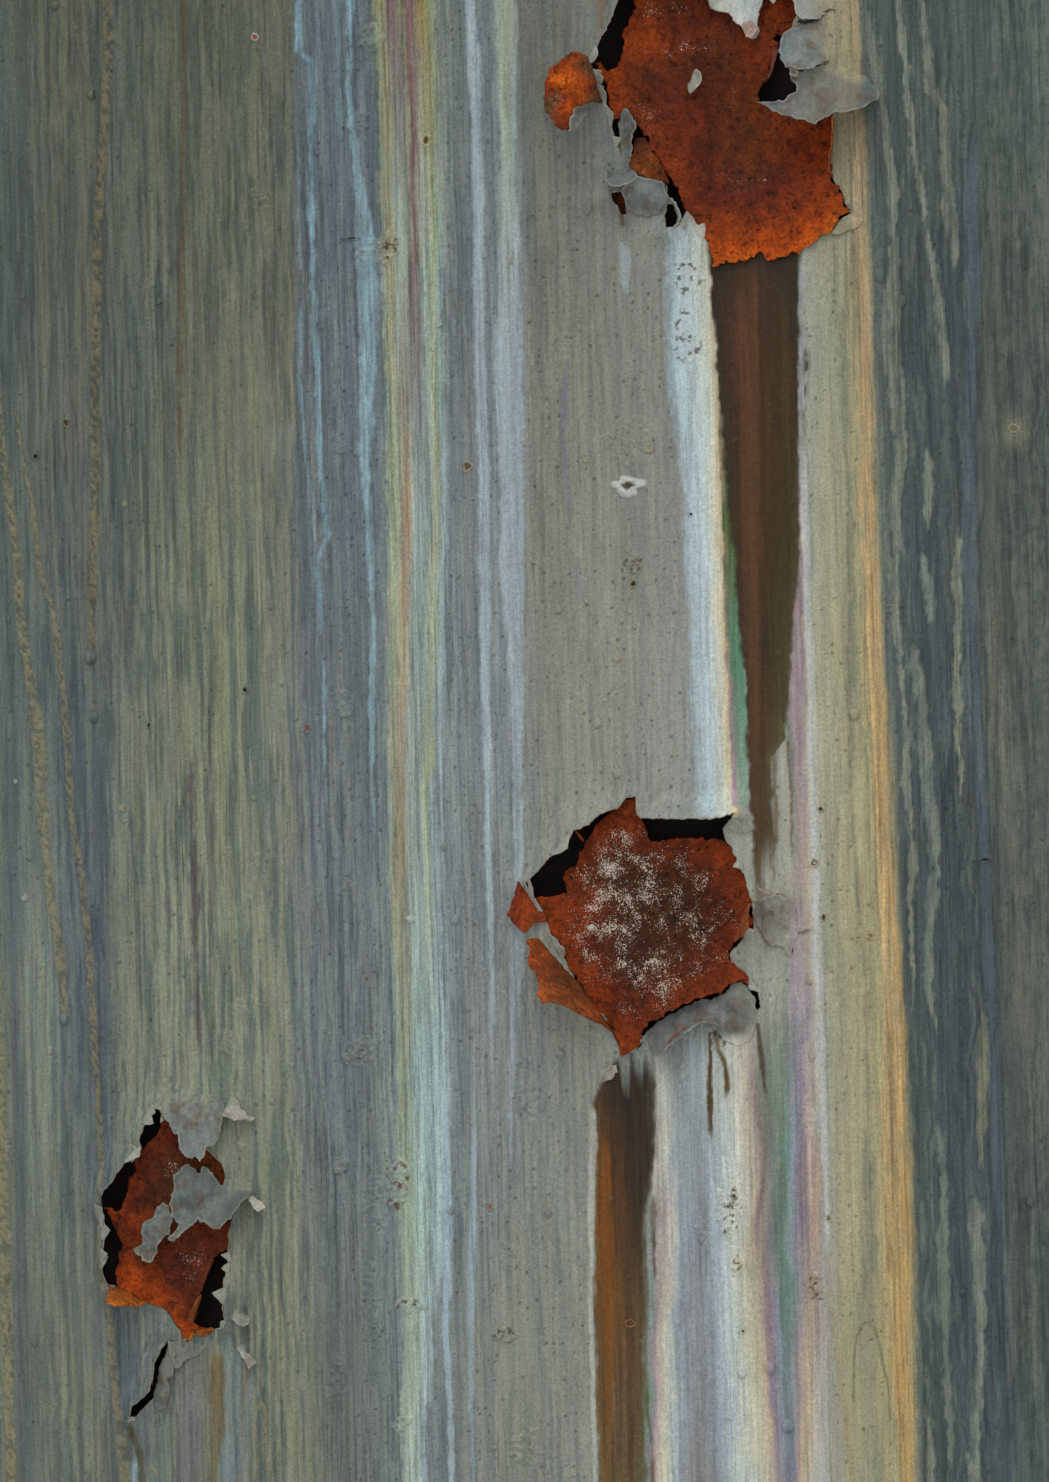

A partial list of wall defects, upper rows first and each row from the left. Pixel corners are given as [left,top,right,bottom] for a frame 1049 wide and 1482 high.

rust [593,0,608,33]
peeling [543,0,880,267]
rust [704,243,812,909]
peeling [507,796,798,1085]
peeling [93,1076,265,1369]
rust [590,1049,659,1482]